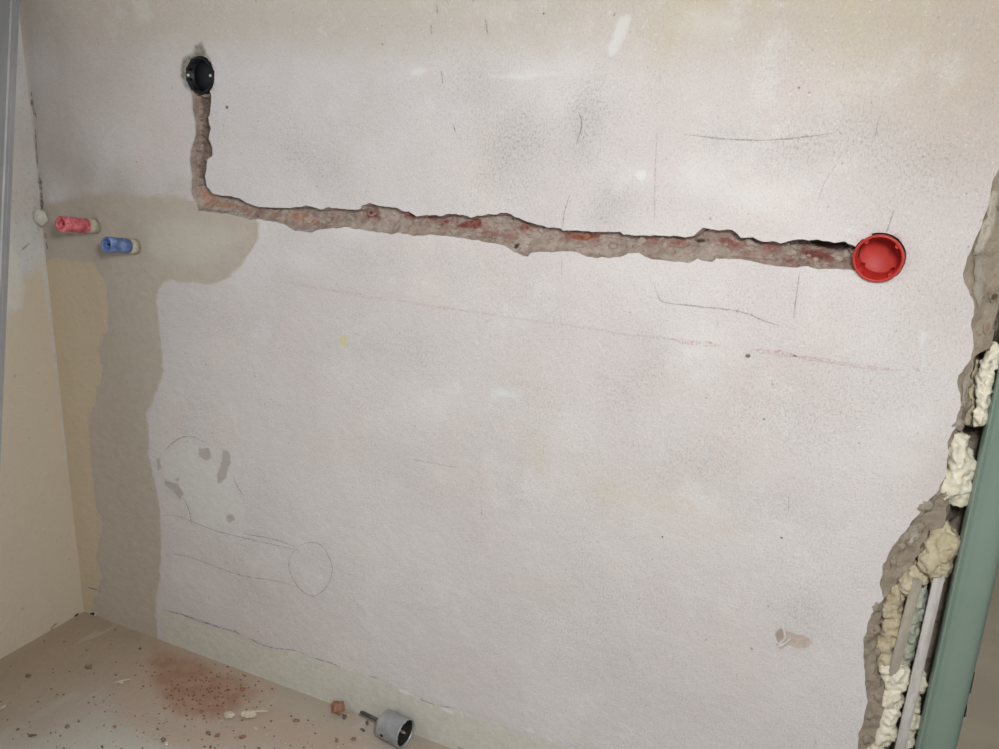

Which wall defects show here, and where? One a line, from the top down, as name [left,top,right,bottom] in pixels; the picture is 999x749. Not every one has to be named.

spalling [850,170,999,749]